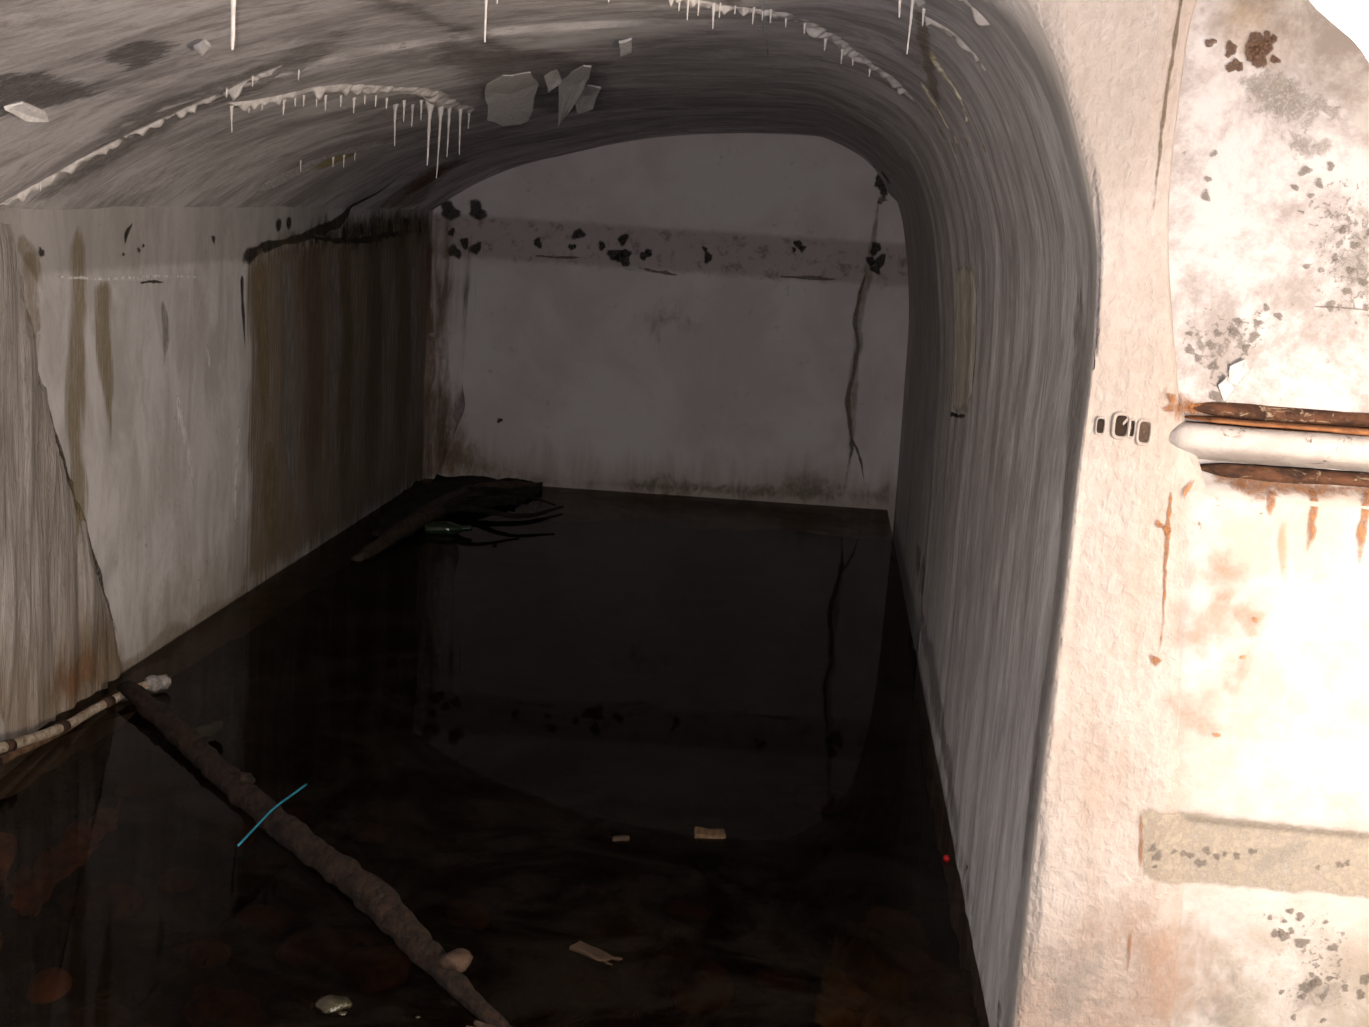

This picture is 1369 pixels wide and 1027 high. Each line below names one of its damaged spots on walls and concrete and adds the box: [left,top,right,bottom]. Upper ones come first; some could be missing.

efflorescence [0,64,475,205]
efflorescence [484,0,498,42]
peeling [484,65,601,128]
peeling [619,37,632,57]
efflorescence [667,0,990,156]
spalling [1205,30,1369,324]
water stain [234,200,487,581]
crack [845,277,865,473]
peeling [1182,304,1283,402]
crack [39,383,113,621]
corrosion [1156,481,1194,615]
corrosion [1217,475,1369,547]